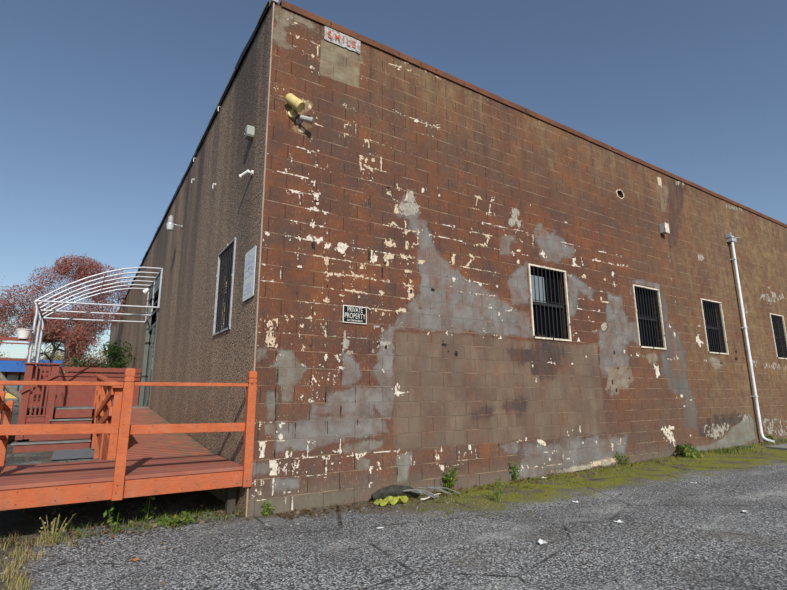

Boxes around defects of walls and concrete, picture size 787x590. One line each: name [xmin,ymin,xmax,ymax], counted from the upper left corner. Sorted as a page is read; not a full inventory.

peeling [273,5,364,88]
spalling [358,139,391,181]
peeling [257,160,534,403]
peeling [563,242,624,288]
spalling [661,425,676,447]
spalling [704,423,729,439]
peeling [252,416,415,510]